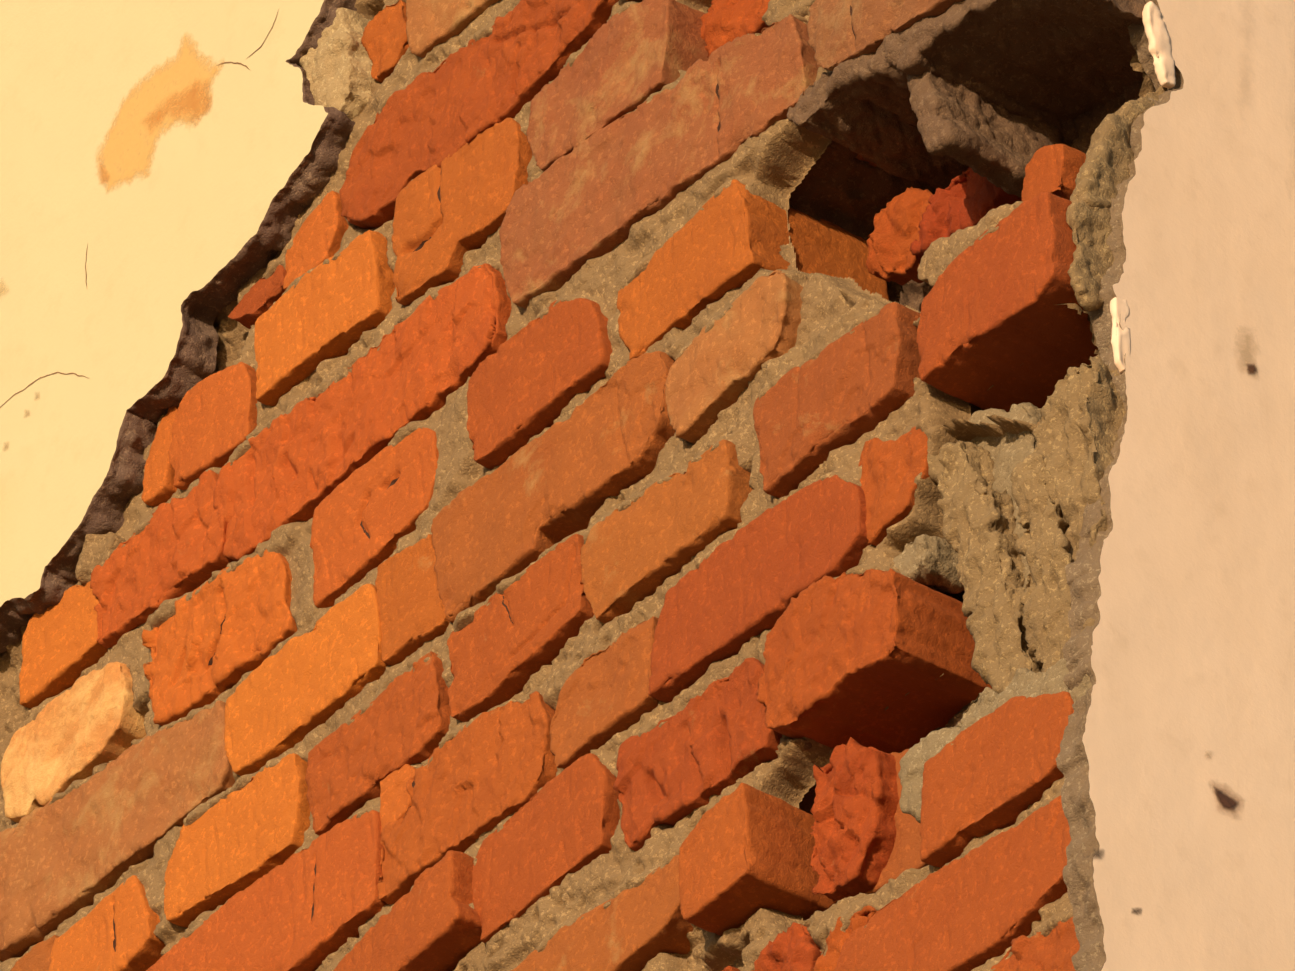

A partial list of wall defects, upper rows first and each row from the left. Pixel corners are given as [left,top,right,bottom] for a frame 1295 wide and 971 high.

crack [217,12,278,70]
flaking render [332,0,963,309]
flaking render [787,0,1176,189]
crack [4,372,87,404]
flaking render [0,0,520,832]
flaking render [146,53,1168,971]
flaking render [0,701,235,971]